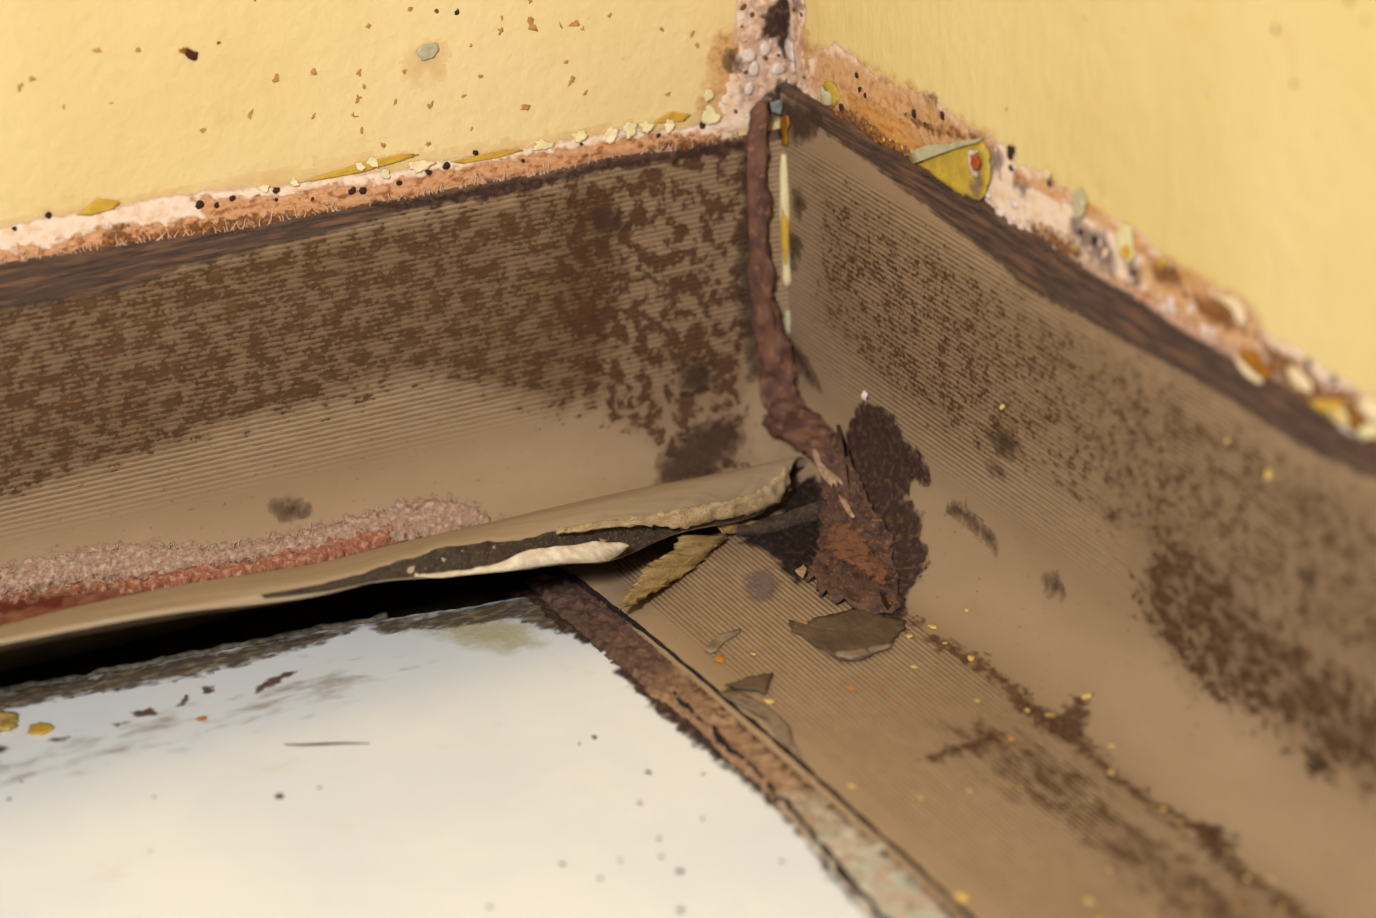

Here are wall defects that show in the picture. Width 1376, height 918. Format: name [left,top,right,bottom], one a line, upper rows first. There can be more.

leakage [0,140,753,497]
peeling [0,0,1376,444]
leakage [0,492,501,603]
leakage [739,476,823,600]
corrosion [822,522,888,584]
leakage [782,100,1376,808]
leakage [610,661,859,905]